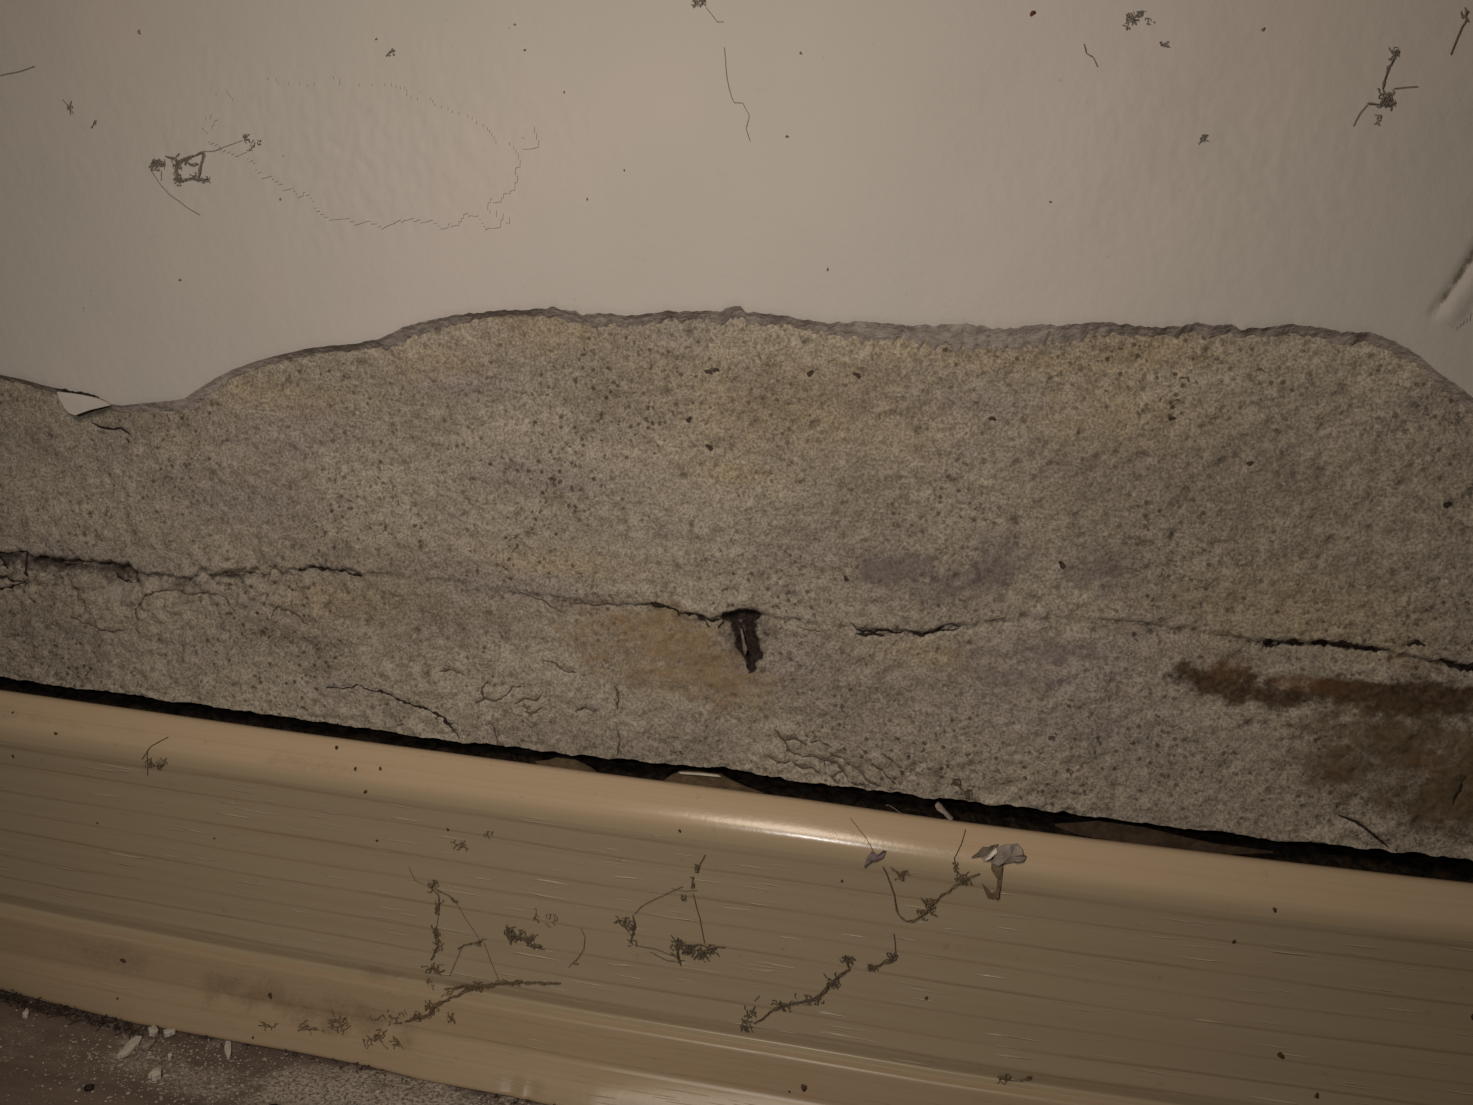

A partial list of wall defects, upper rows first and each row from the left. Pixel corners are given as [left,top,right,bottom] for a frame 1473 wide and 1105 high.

crack [0,551,259,633]
crack [298,566,363,577]
flaking render [0,306,1473,861]
crack [270,605,308,625]
crack [796,617,1005,637]
crack [1100,617,1158,625]
crack [1214,633,1473,672]
crack [1453,776,1466,804]